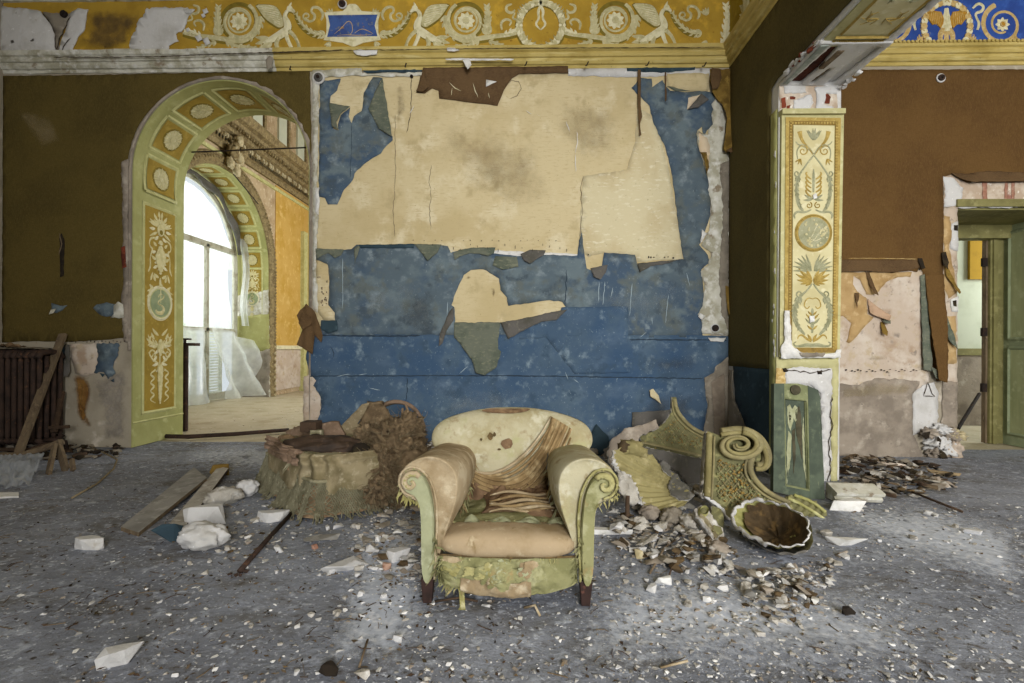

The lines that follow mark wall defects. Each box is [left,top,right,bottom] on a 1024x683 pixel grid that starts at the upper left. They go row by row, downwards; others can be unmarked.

flaking render [59,8,89,50]
peeling [129,7,210,49]
flaking render [568,68,711,78]
spalling [779,0,942,111]
spalling [121,49,422,351]
peeling [697,100,730,342]
flaking render [940,175,1024,428]
flaking render [70,342,114,382]
flaking render [303,352,321,421]
flaking render [704,357,744,435]
flaking render [771,270,930,482]